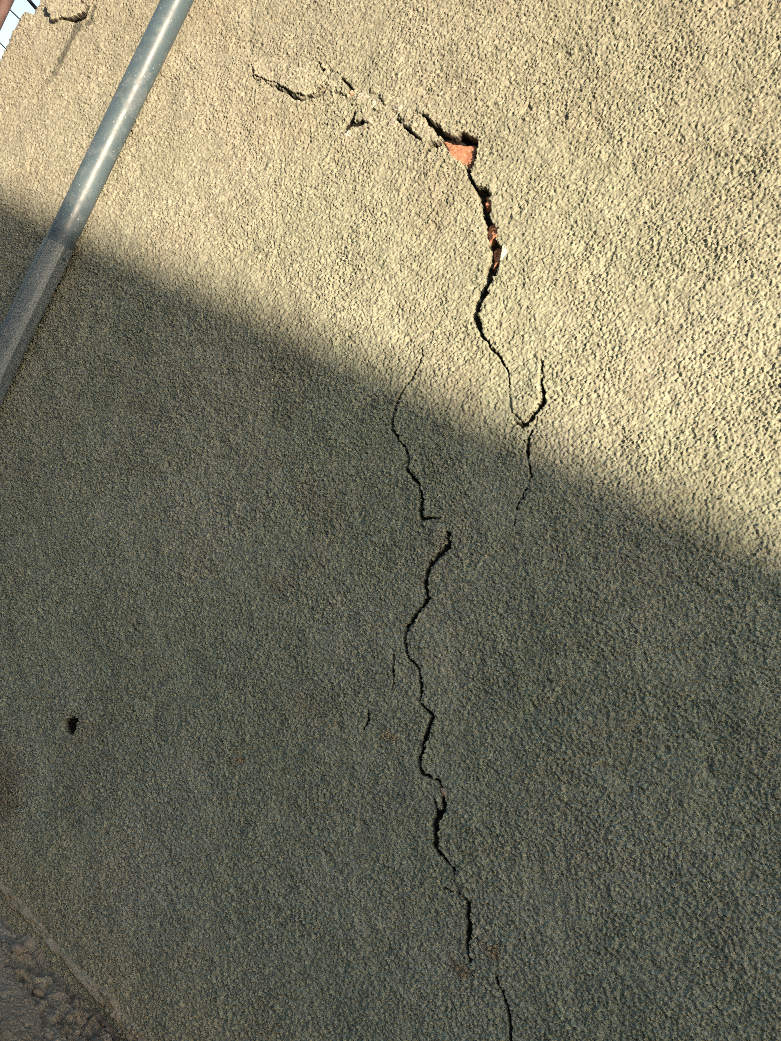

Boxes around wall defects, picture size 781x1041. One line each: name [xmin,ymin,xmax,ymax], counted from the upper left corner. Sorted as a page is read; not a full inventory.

crack [45,0,90,24]
crack [399,118,546,526]
crack [393,383,473,960]
crack [496,977,513,1041]